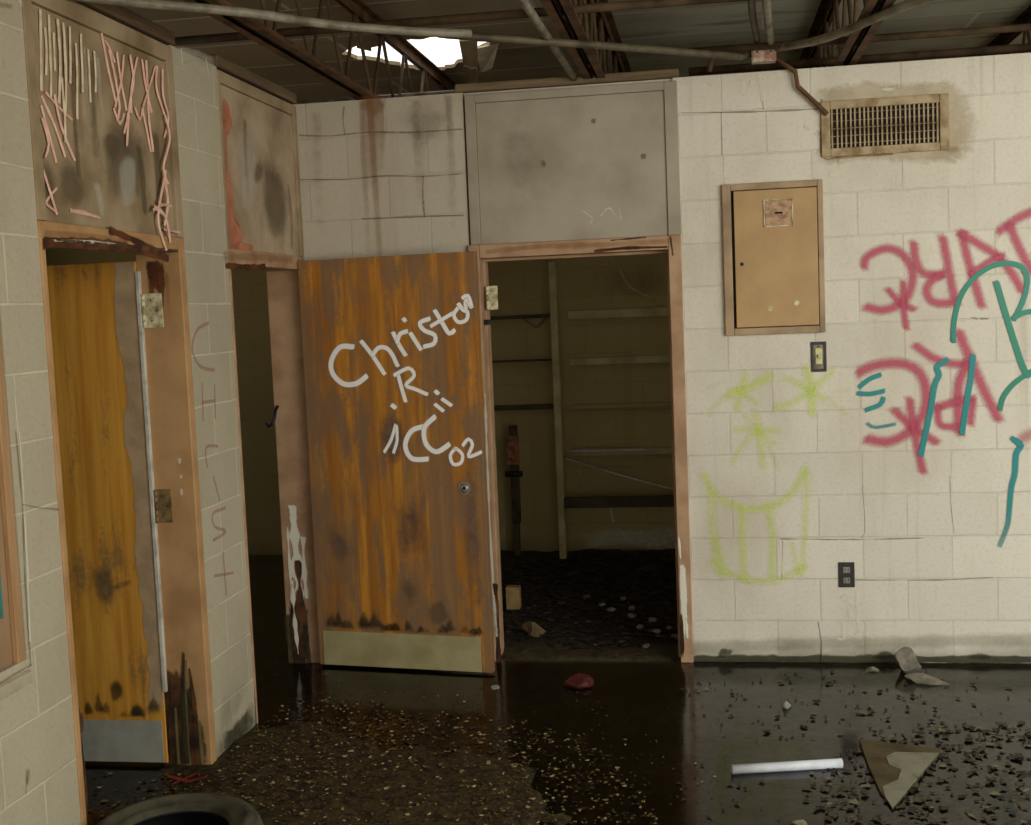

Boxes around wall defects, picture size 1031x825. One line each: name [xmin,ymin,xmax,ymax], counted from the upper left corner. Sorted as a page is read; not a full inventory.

corrosion [43,226,169,307]